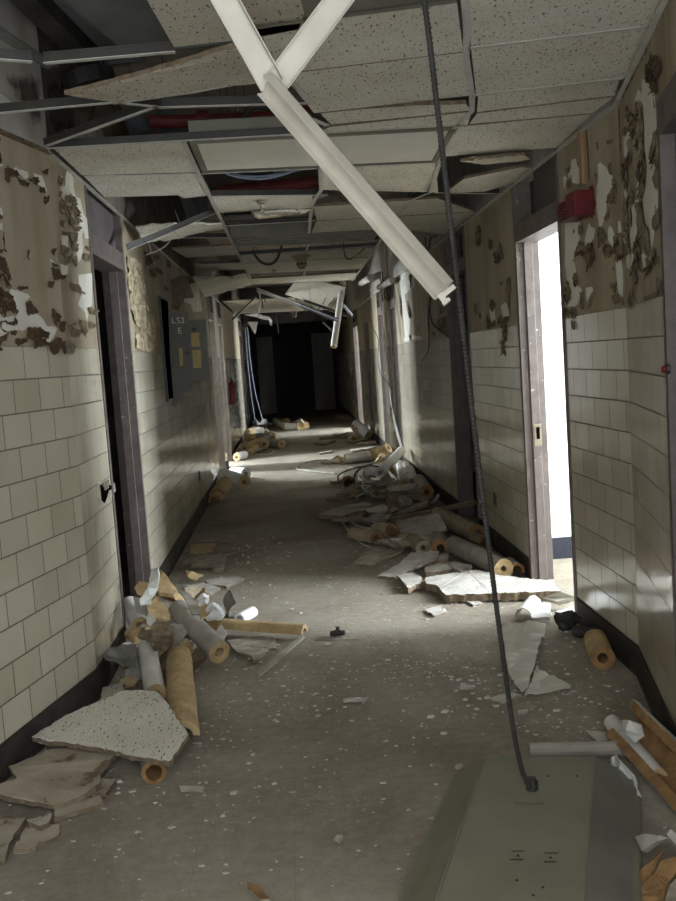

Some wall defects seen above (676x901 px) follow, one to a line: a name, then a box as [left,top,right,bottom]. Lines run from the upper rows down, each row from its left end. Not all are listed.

peeling [0,152,99,355]
peeling [473,276,511,356]
peeling [561,53,661,330]